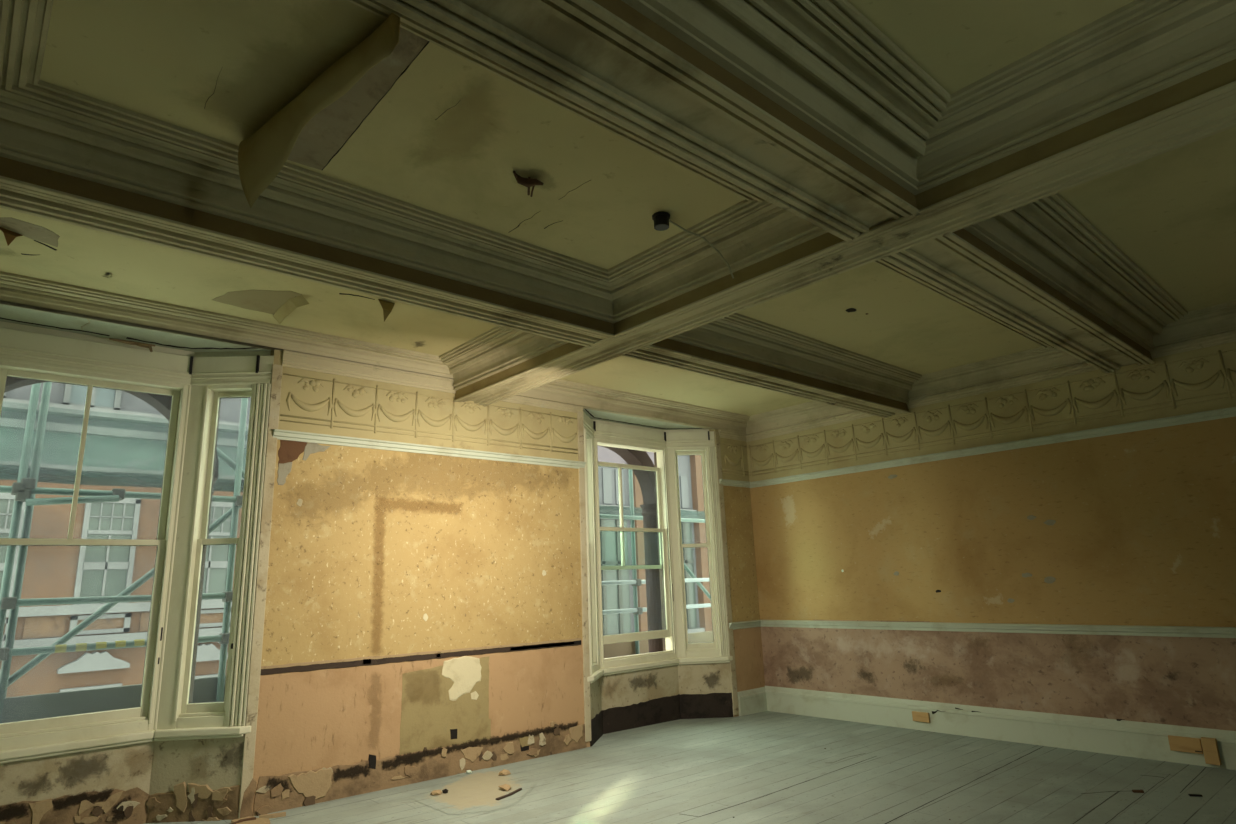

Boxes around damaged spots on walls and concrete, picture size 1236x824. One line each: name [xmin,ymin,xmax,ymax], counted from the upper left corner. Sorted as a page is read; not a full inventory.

peeling [339,293,395,321]
flaking render [277,440,330,485]
damp [814,620,965,681]
damp [1086,635,1165,710]
flaking render [423,721,583,771]
damp [0,803,29,821]
flaking render [0,798,54,824]
damp [52,789,131,823]
flaking render [74,791,140,824]
flaking render [255,767,333,806]